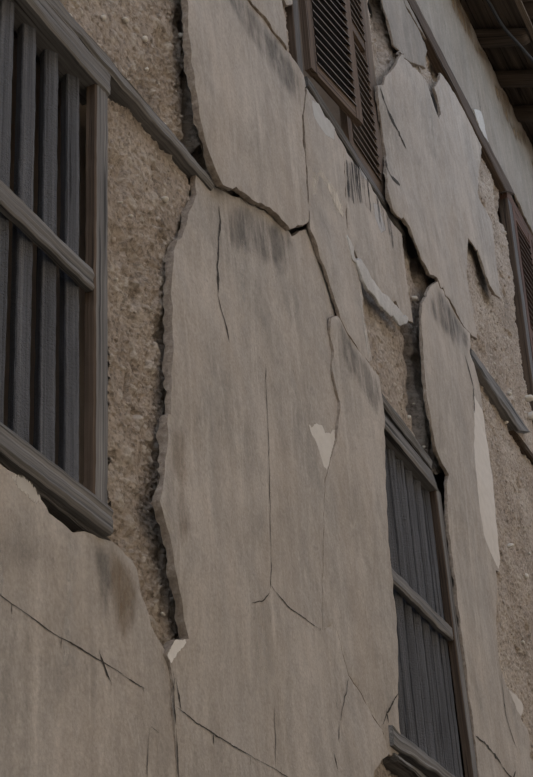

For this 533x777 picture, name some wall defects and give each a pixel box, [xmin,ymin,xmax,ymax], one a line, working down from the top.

peeling [248,0,292,57]
spalling [60,0,233,196]
crack [217,210,229,339]
peeling [0,99,191,777]
peeling [302,0,533,777]
crack [0,595,144,691]
crack [173,674,288,777]